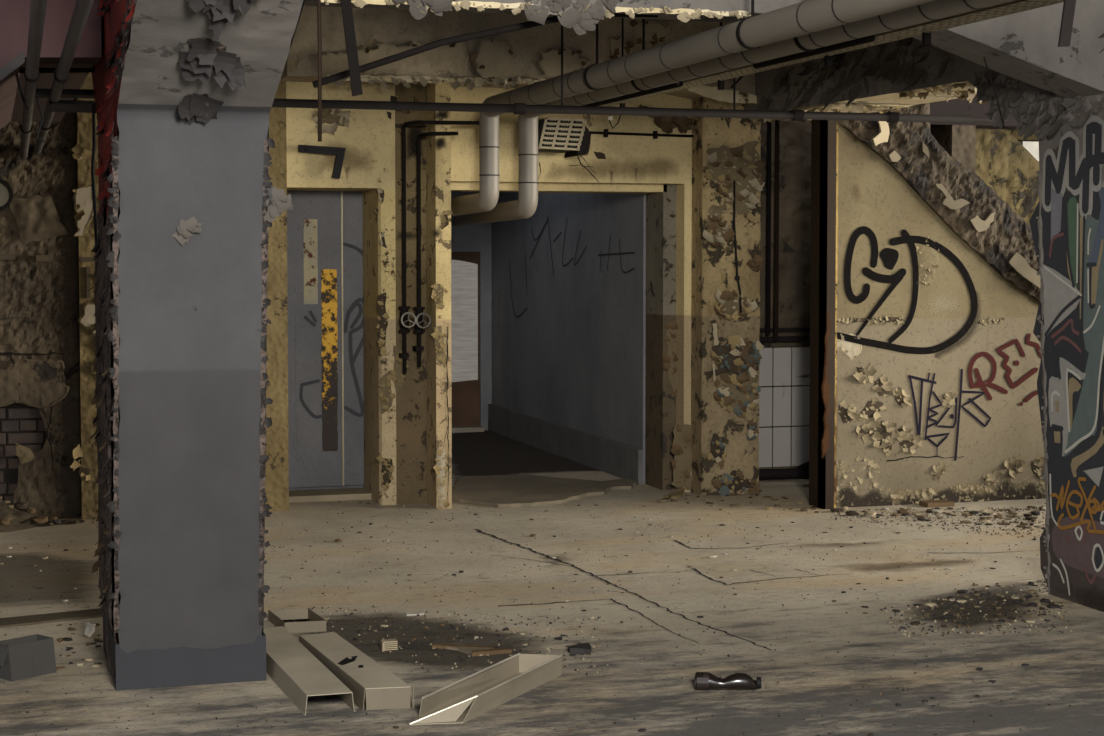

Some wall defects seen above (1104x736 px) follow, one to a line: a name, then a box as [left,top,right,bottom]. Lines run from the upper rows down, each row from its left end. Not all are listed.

peeling [177,0,262,126]
spalling [312,36,590,135]
peeling [321,0,751,59]
peeling [755,37,1104,140]
peeling [702,141,767,249]
peeling [70,0,137,633]
peeling [258,138,293,625]
corrosion [321,269,338,451]
peeling [376,292,409,414]
peeling [711,337,764,440]
peeling [835,171,1051,595]
peeling [433,449,450,509]